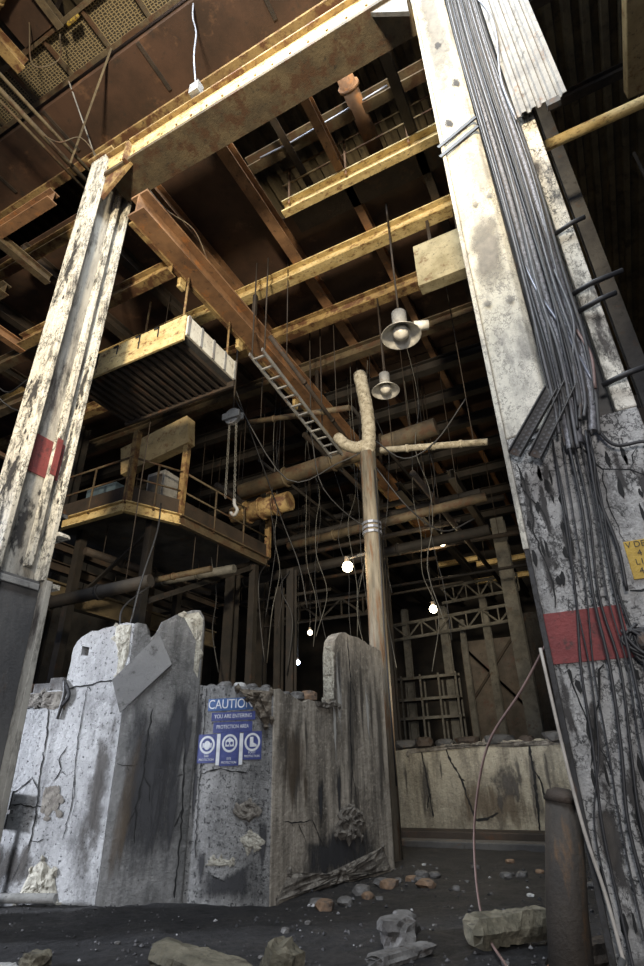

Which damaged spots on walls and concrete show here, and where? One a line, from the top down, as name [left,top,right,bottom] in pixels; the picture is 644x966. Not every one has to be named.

crack [11,680,112,877]
leakage [151,694,192,847]
crack [421,752,434,817]
crack [446,750,499,821]
spalling [233,798,265,856]
spalling [20,855,62,905]